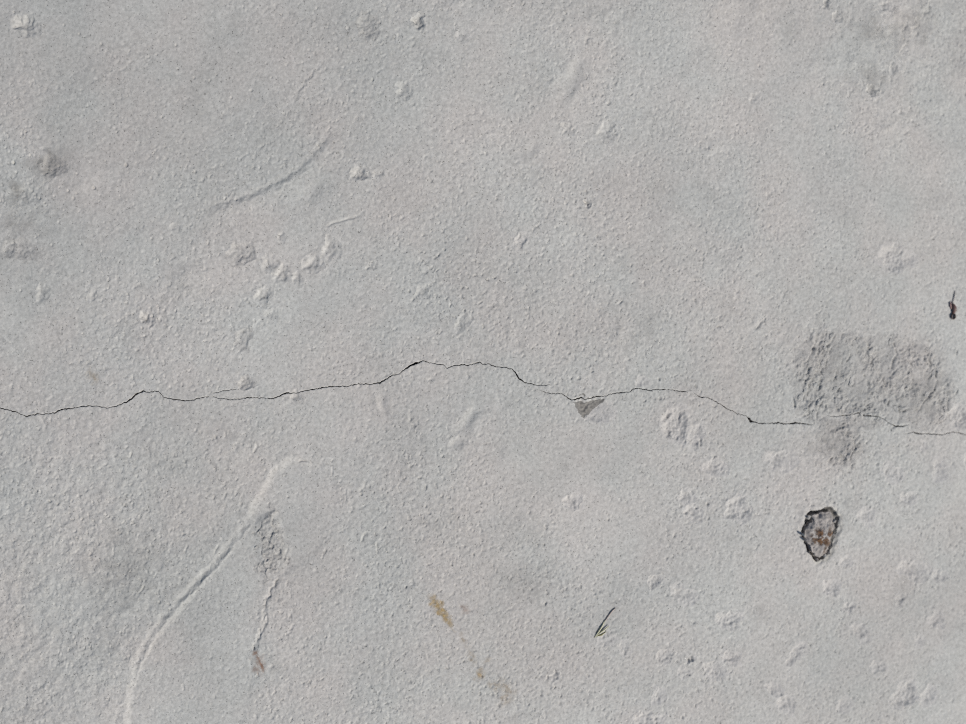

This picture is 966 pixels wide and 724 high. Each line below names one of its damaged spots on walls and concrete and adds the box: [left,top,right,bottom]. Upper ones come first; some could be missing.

crack [0,358,966,438]
rust [812,529,833,550]